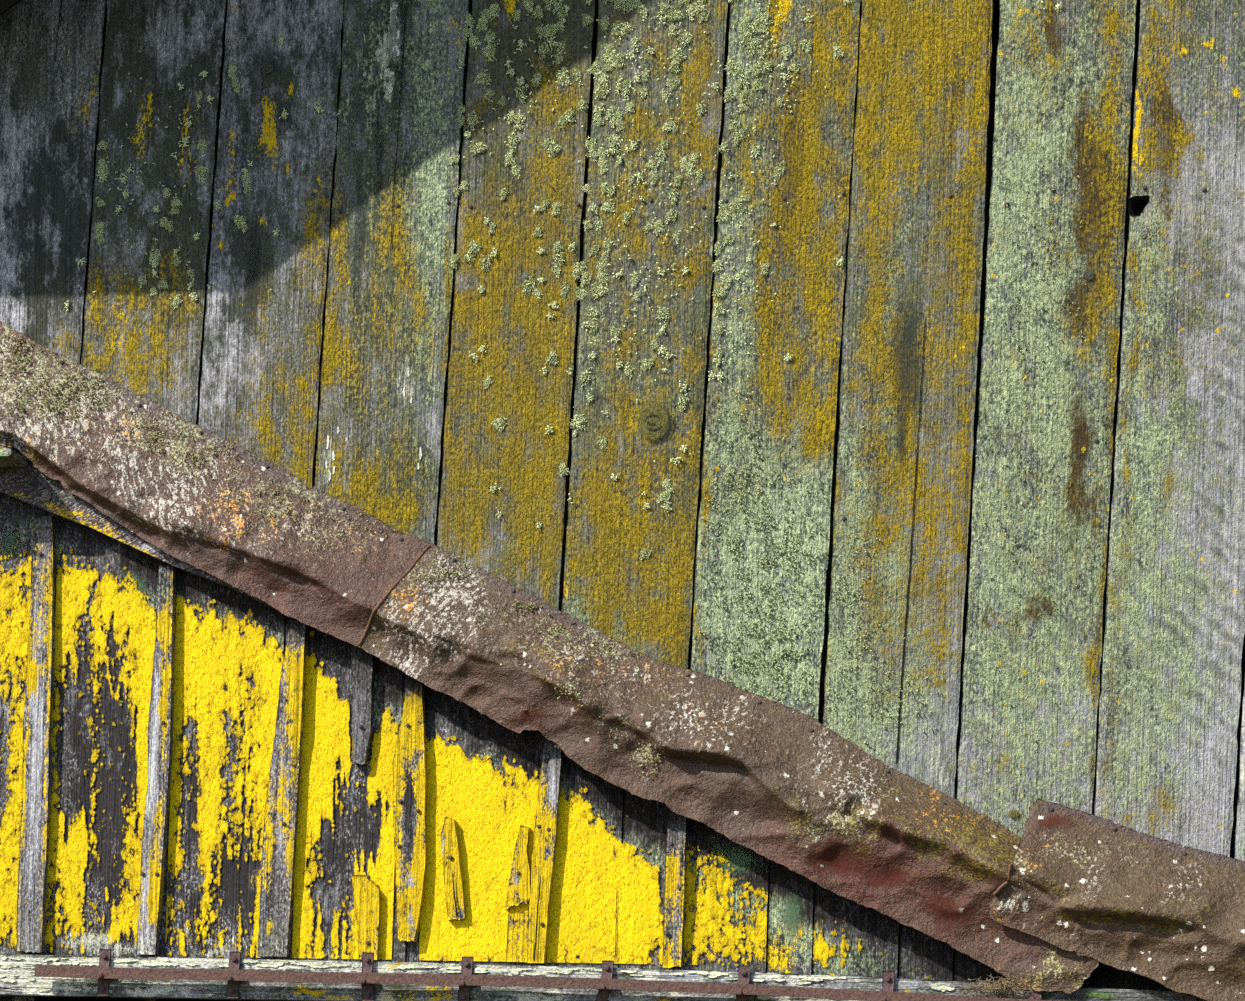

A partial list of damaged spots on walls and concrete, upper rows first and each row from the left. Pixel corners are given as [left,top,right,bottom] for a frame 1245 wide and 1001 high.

peeling [215,960,349,968]
peeling [397,962,487,973]
peeling [508,967,602,975]
peeling [673,970,738,980]
peeling [753,976,846,984]